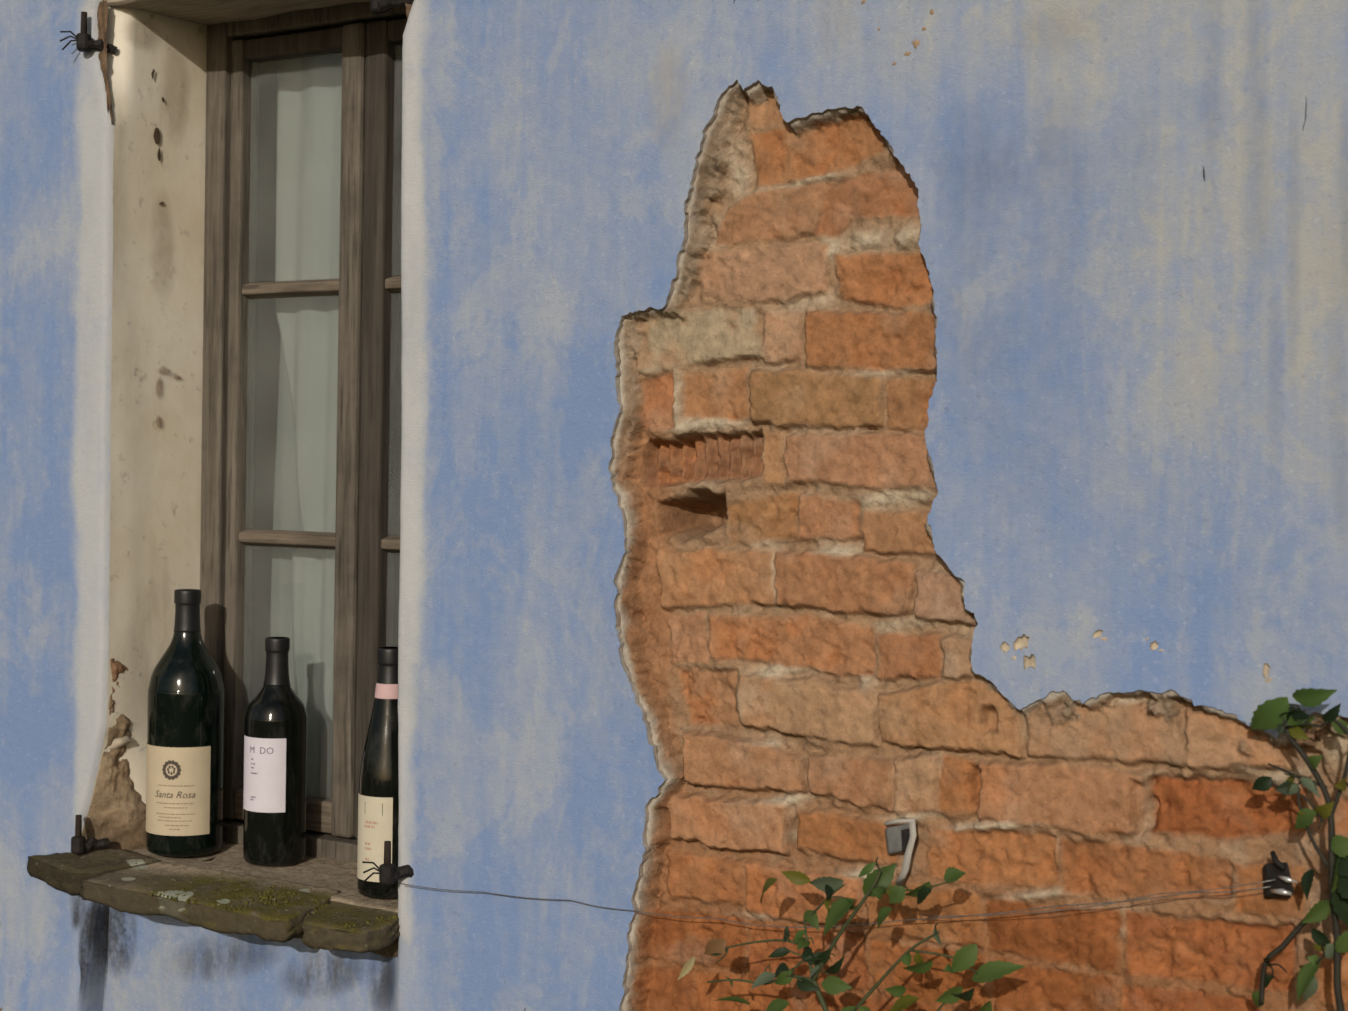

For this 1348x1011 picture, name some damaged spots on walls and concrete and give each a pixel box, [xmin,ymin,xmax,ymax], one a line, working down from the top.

peeling [891,9,934,66]
spalling [608,80,1348,1011]